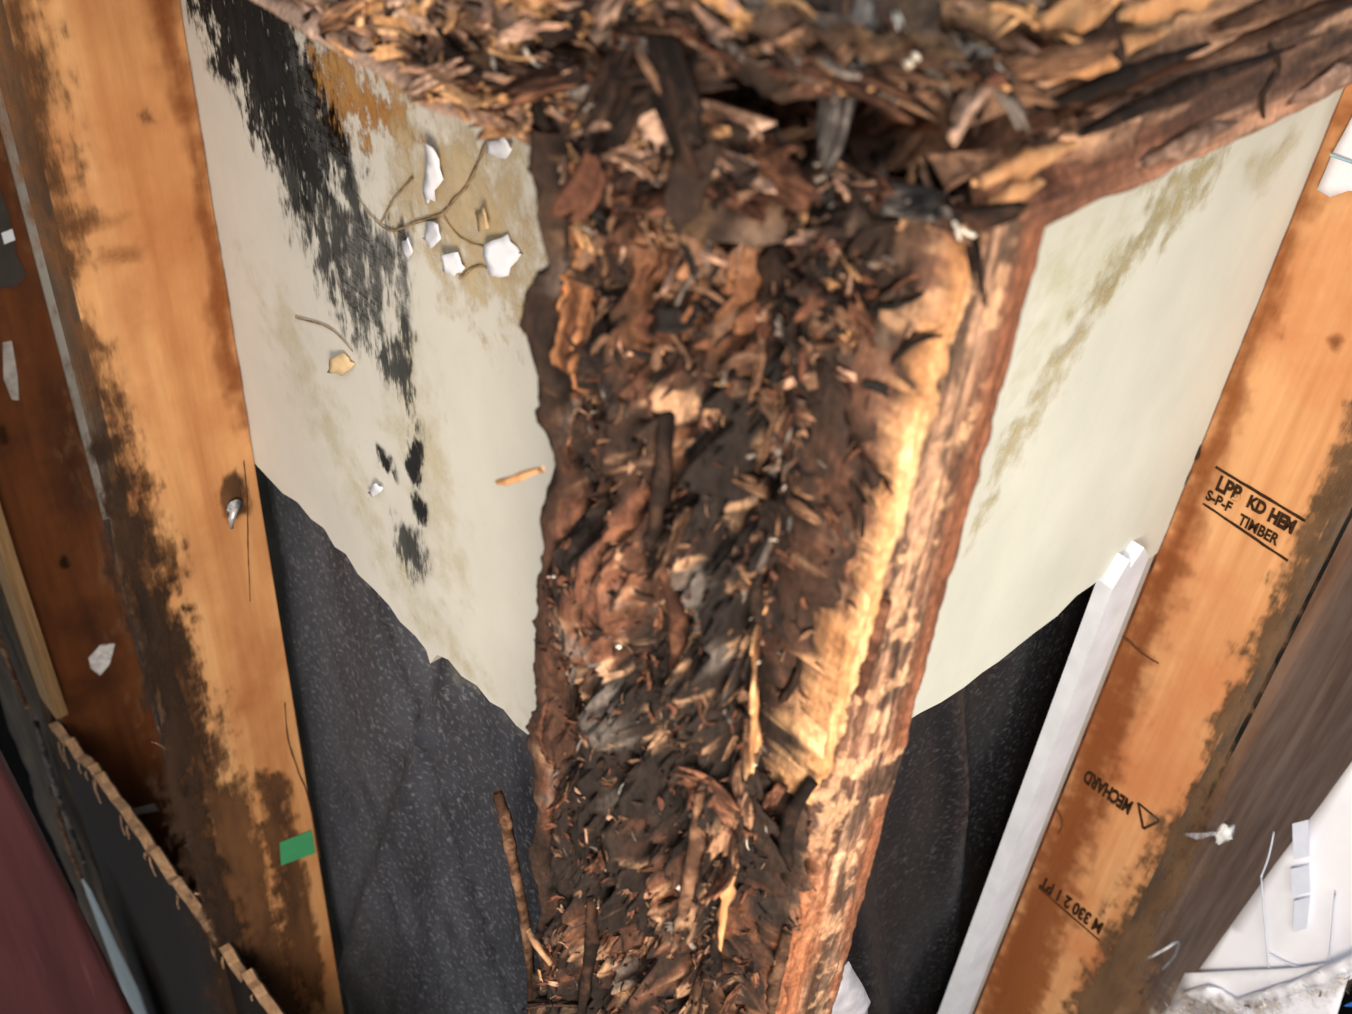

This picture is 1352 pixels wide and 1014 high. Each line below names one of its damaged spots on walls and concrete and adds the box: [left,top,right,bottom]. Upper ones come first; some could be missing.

damp [155,0,544,584]
damp [1092,157,1215,312]
damp [0,0,325,1014]
peeling [653,603,665,636]
peeling [643,506,706,583]
peeling [732,244,879,704]
damp [983,232,1352,1014]
peeling [672,694,788,904]
peeling [522,977,594,1012]
peeling [637,937,655,959]
peeling [658,896,679,908]
peeling [687,972,760,1013]